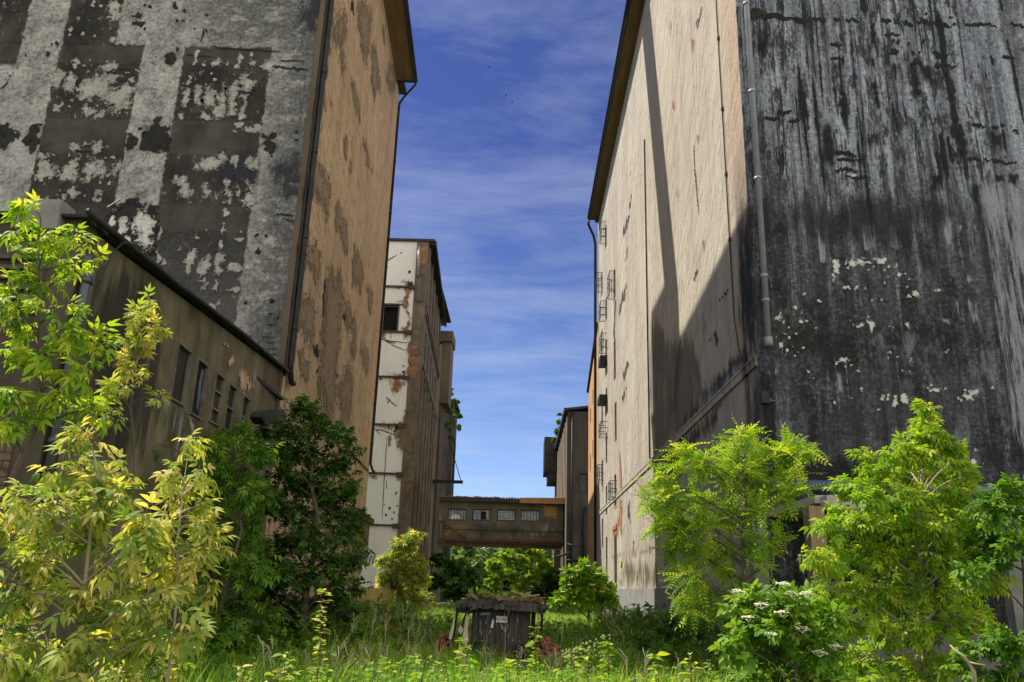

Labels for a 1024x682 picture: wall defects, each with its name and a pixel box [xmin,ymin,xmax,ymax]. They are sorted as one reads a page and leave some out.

flaking render [155,47,179,66]
damp [757,29,775,55]
damp [860,0,876,44]
peeling [331,0,397,176]
flaking render [0,50,277,310]
damp [786,12,1024,443]
peeling [298,156,382,431]
peeling [831,255,920,302]
peeling [774,306,817,357]
peeling [224,342,254,394]
peeling [877,393,909,411]